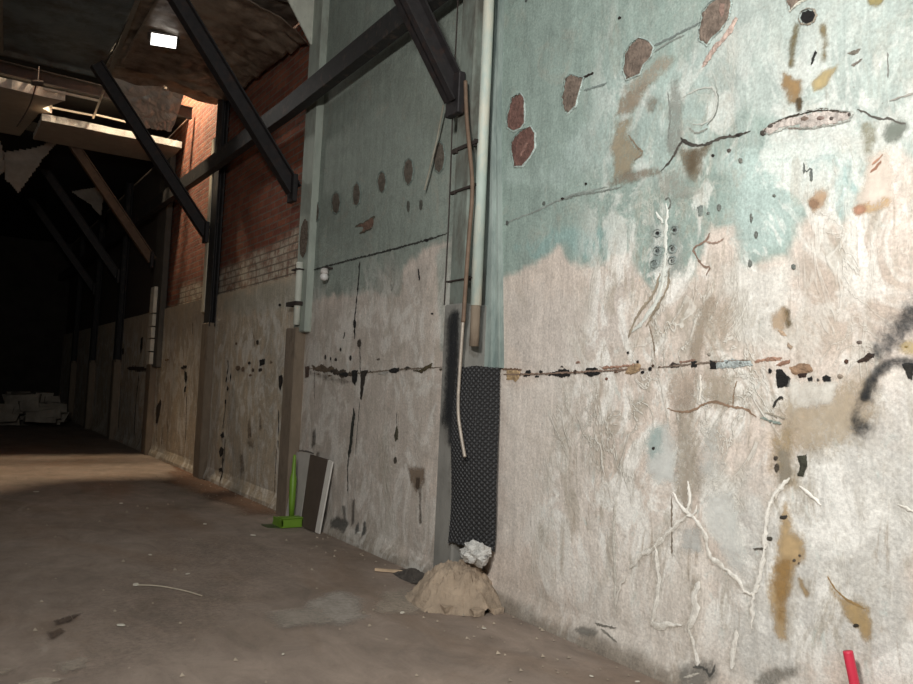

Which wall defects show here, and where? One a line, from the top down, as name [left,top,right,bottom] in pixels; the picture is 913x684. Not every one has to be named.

spalling [786,0,806,12]
spalling [622,0,738,81]
spalling [561,72,607,116]
spalling [403,158,414,185]
spalling [433,140,446,174]
spalling [505,92,536,168]
crack [661,131,750,171]
crack [314,233,447,491]
leakage [691,297,728,362]
leakage [773,381,871,468]
leakage [611,375,821,684]
leakage [576,623,617,642]